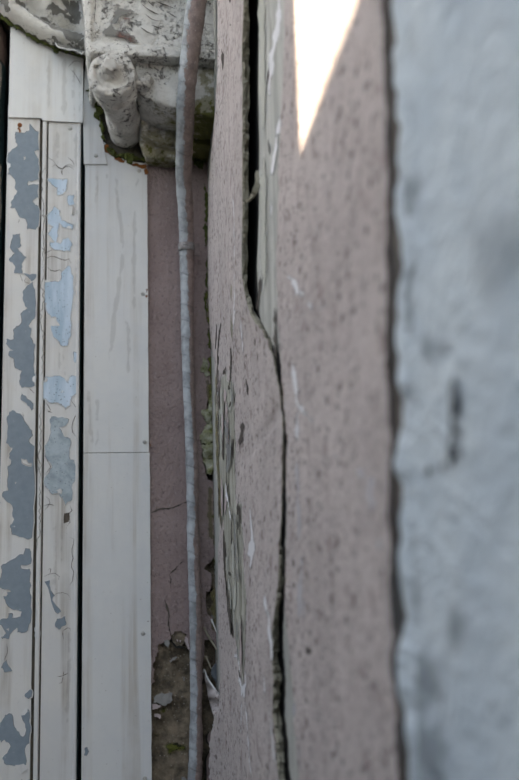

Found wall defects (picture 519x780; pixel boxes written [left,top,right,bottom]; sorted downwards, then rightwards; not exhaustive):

peeling [0,0,86,55]
peeling [0,123,76,640]
crack [215,319,233,391]
crack [230,0,291,780]
flaking render [199,356,246,780]
peeling [0,689,33,774]
flaking render [151,631,190,780]